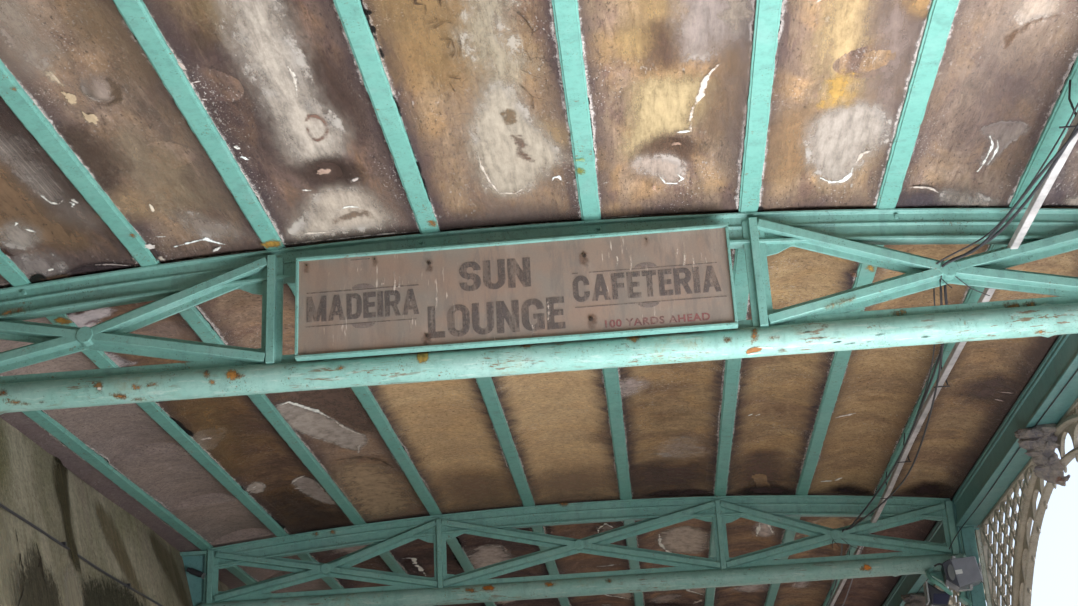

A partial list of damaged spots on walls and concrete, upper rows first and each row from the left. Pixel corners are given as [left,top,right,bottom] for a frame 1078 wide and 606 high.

damp [0,3,118,188]
damp [0,127,138,277]
damp [197,0,407,245]
damp [381,0,564,195]
damp [621,0,753,192]
damp [773,0,932,183]
damp [1005,0,1057,49]
damp [53,461,83,606]
damp [98,507,144,599]
damp [151,536,189,606]